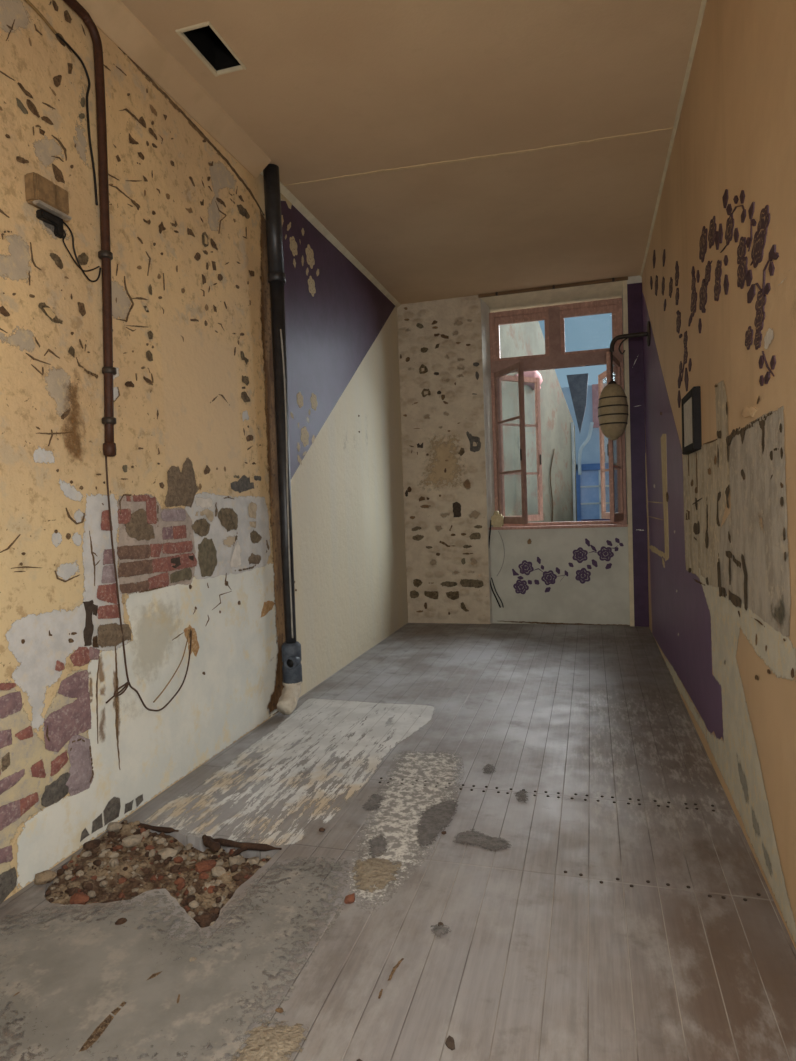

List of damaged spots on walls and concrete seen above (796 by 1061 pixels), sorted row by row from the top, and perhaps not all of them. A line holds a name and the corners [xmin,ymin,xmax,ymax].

peeling [0,0,33,33]
flaking render [49,0,86,36]
peeling [0,33,88,184]
flaking render [400,307,479,432]
leakage [63,385,81,458]
flaking render [405,487,441,541]
flaking render [436,511,482,540]
flaking render [261,601,275,617]
flaking render [410,558,483,615]
peeling [645,380,796,944]
peeling [145,698,434,846]